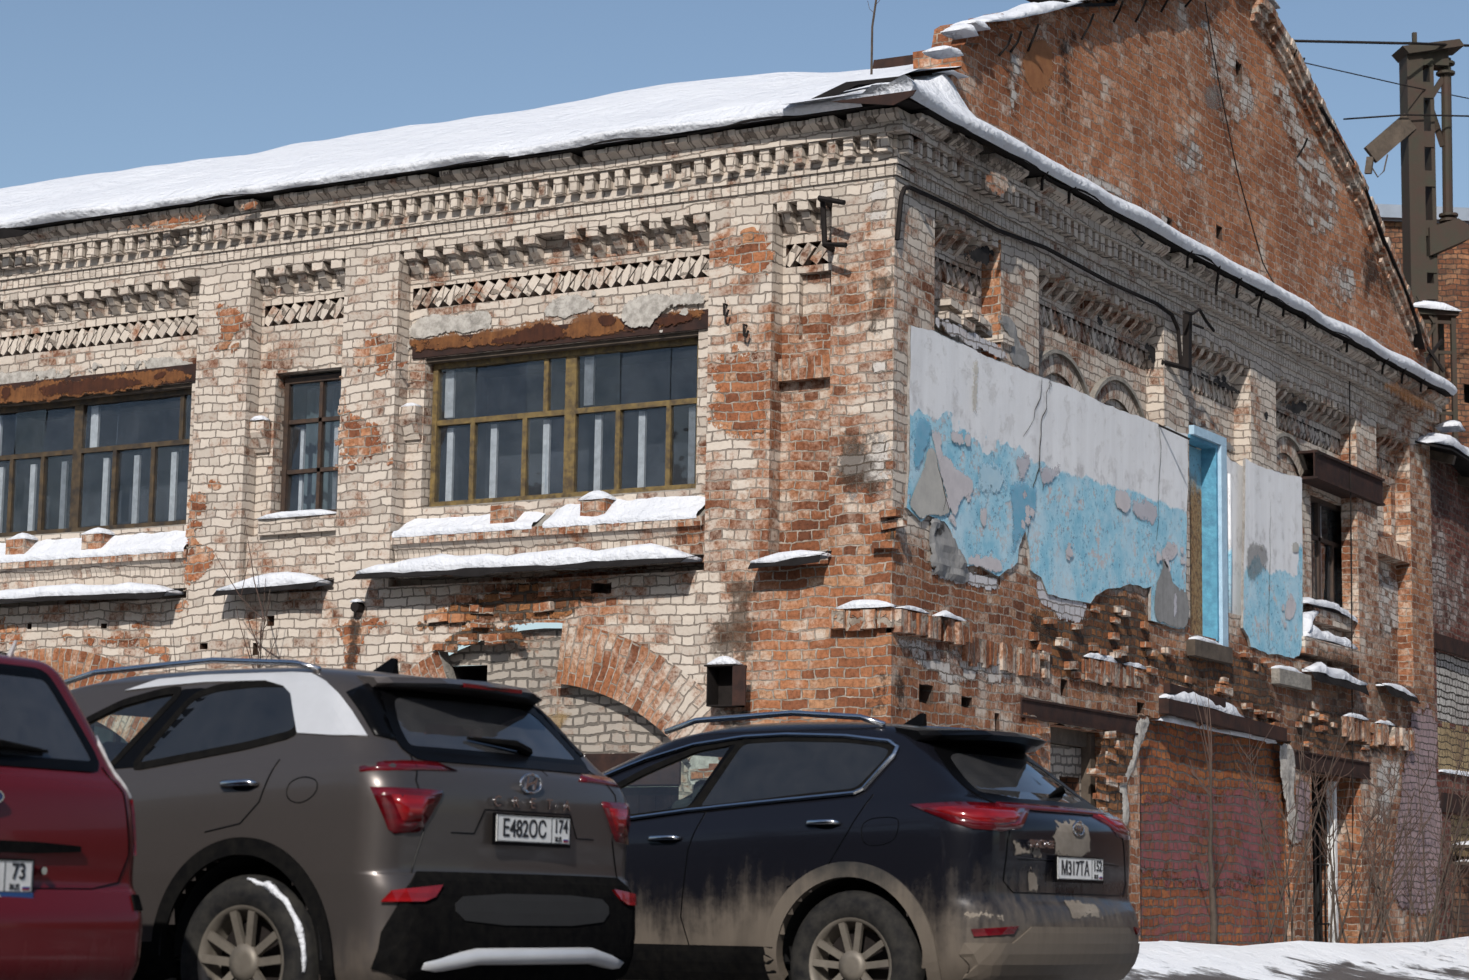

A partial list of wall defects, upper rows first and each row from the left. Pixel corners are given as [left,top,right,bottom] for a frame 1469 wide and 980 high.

peeling [214,303,252,353]
rust [409,312,633,352]
rust [655,308,705,329]
rust [0,368,192,403]
flaking render [0,347,193,384]
peeling [333,311,492,470]
crack [1024,383,1051,538]
flaking render [872,417,1060,590]
spalling [1029,541,1412,756]
spalling [919,684,933,705]
spalling [961,696,972,708]
spalling [1018,713,1050,766]